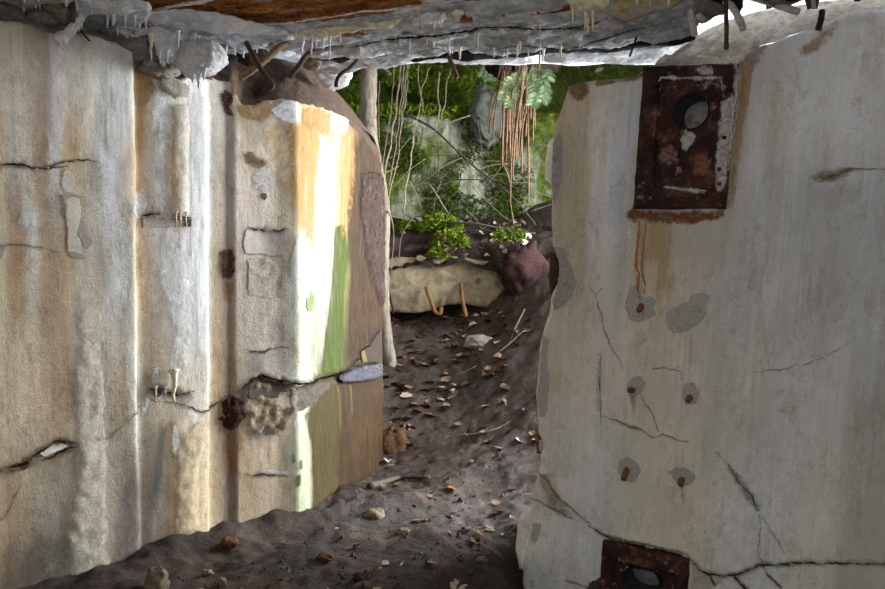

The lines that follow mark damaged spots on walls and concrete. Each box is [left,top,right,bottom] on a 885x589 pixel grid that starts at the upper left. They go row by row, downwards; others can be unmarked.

spalling [261,0,885,91]
leakage [566,0,610,34]
crack [2,159,97,169]
leakage [19,0,480,366]
leakage [680,129,696,150]
corrosion [627,56,753,298]
leakage [715,97,736,192]
spalling [625,285,710,333]
corrosion [219,396,246,474]
spalling [245,378,331,436]
crack [0,438,75,521]
crack [531,451,885,589]